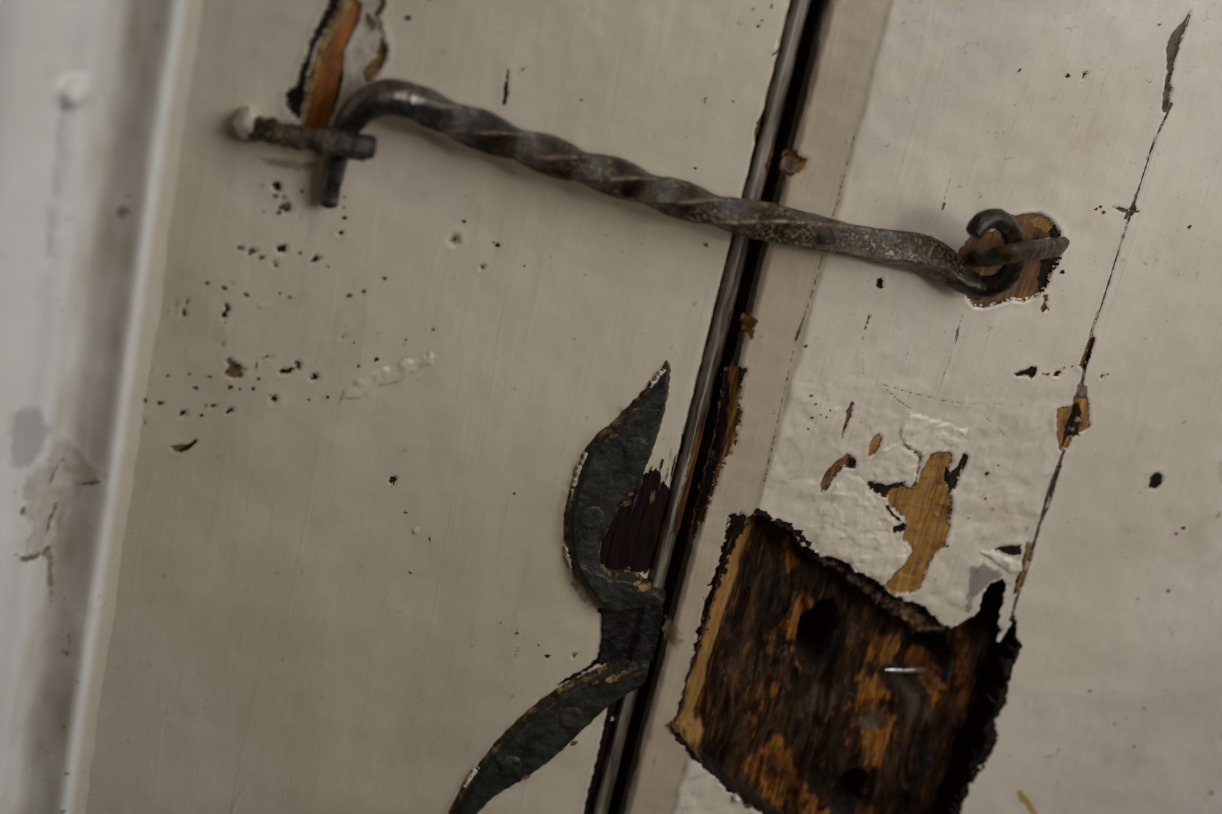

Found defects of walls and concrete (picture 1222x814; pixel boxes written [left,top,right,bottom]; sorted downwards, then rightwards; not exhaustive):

peeling [285,0,389,129]
peeling [966,257,1065,312]
peeling [1011,213,1061,241]
crack [1073,102,1173,402]
peeling [188,342,268,391]
peeling [671,360,748,541]
peeling [842,401,854,436]
peeling [820,434,883,492]
peeling [867,445,968,595]
peeling [995,542,1033,594]
crack [1011,449,1065,616]
peeling [1014,336,1096,451]